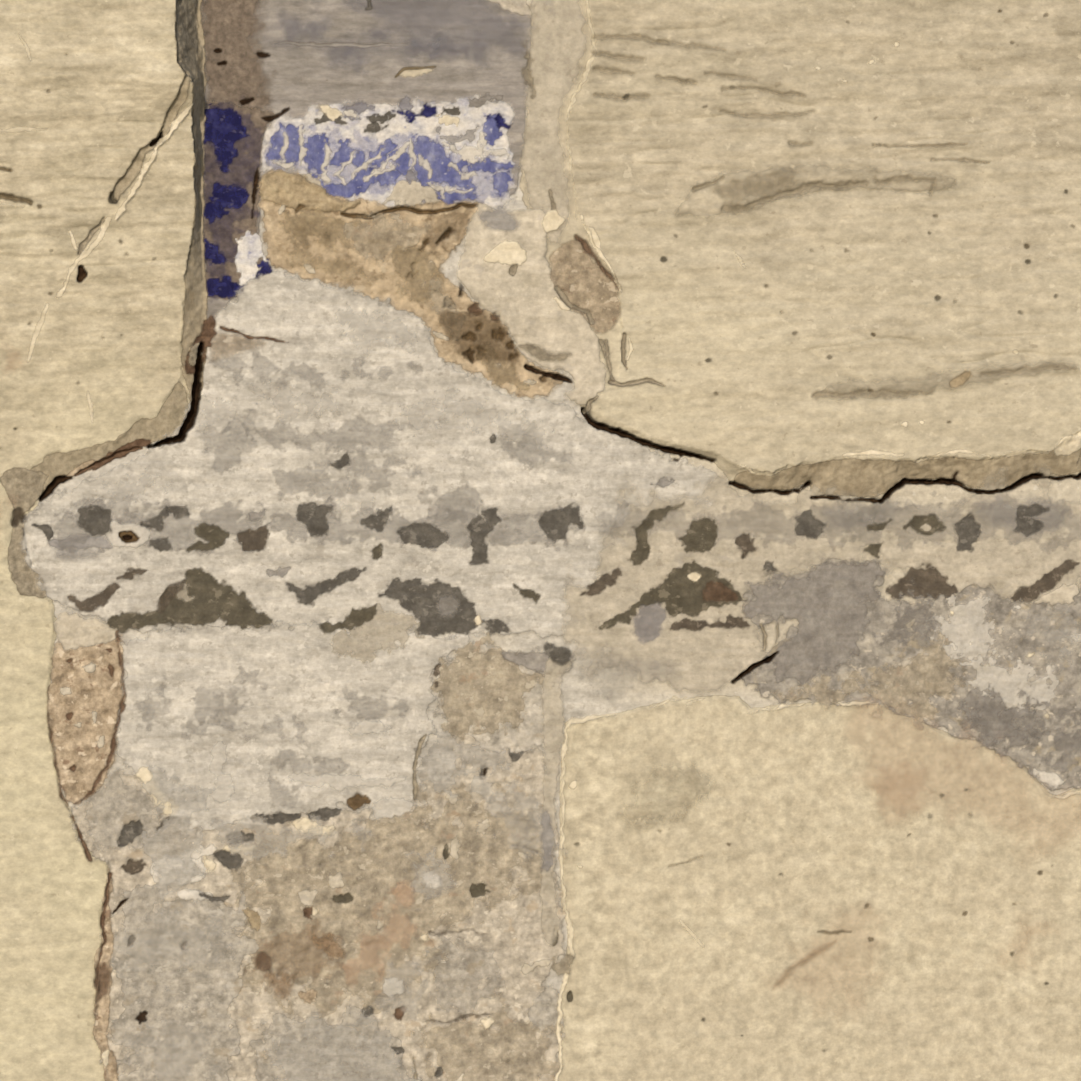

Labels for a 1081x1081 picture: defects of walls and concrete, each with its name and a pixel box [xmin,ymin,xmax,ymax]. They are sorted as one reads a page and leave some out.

crack [27,72,193,362]
peeling [175,0,572,402]
crack [39,343,203,501]
peeling [0,102,1081,804]
crack [581,333,1081,503]
spalling [71,604,575,1081]
spalling [553,714,615,849]
crack [732,624,779,684]